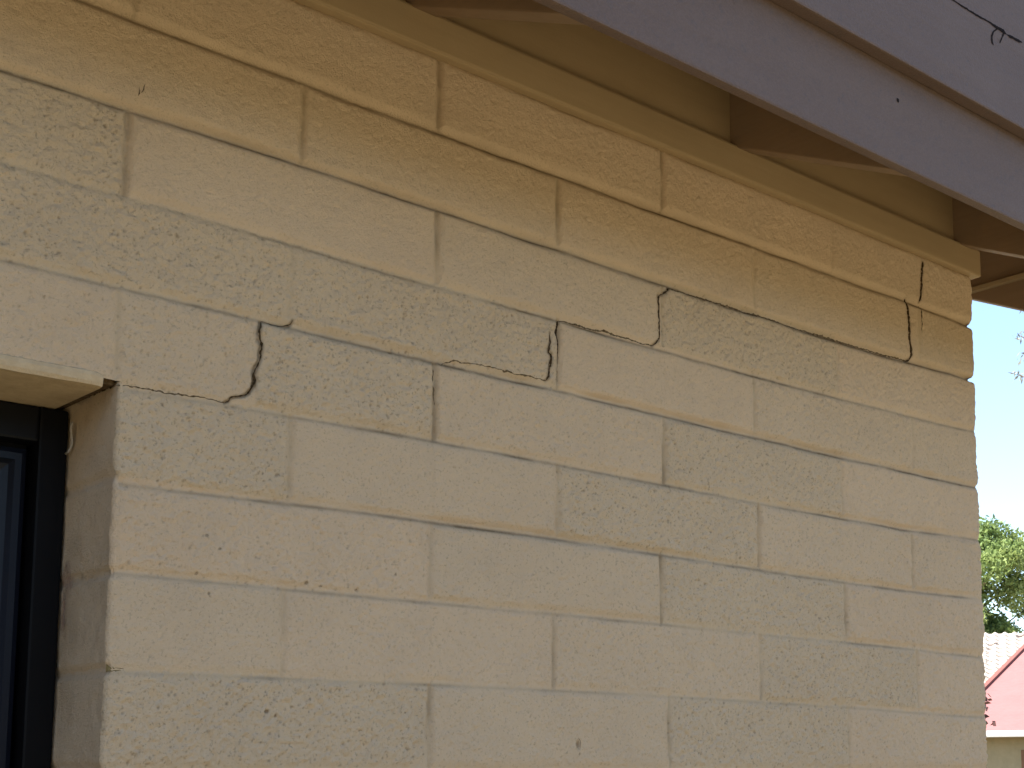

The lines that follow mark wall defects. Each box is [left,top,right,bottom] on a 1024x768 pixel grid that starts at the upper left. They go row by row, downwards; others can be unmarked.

crack [88,321,293,403]
crack [432,262,924,405]